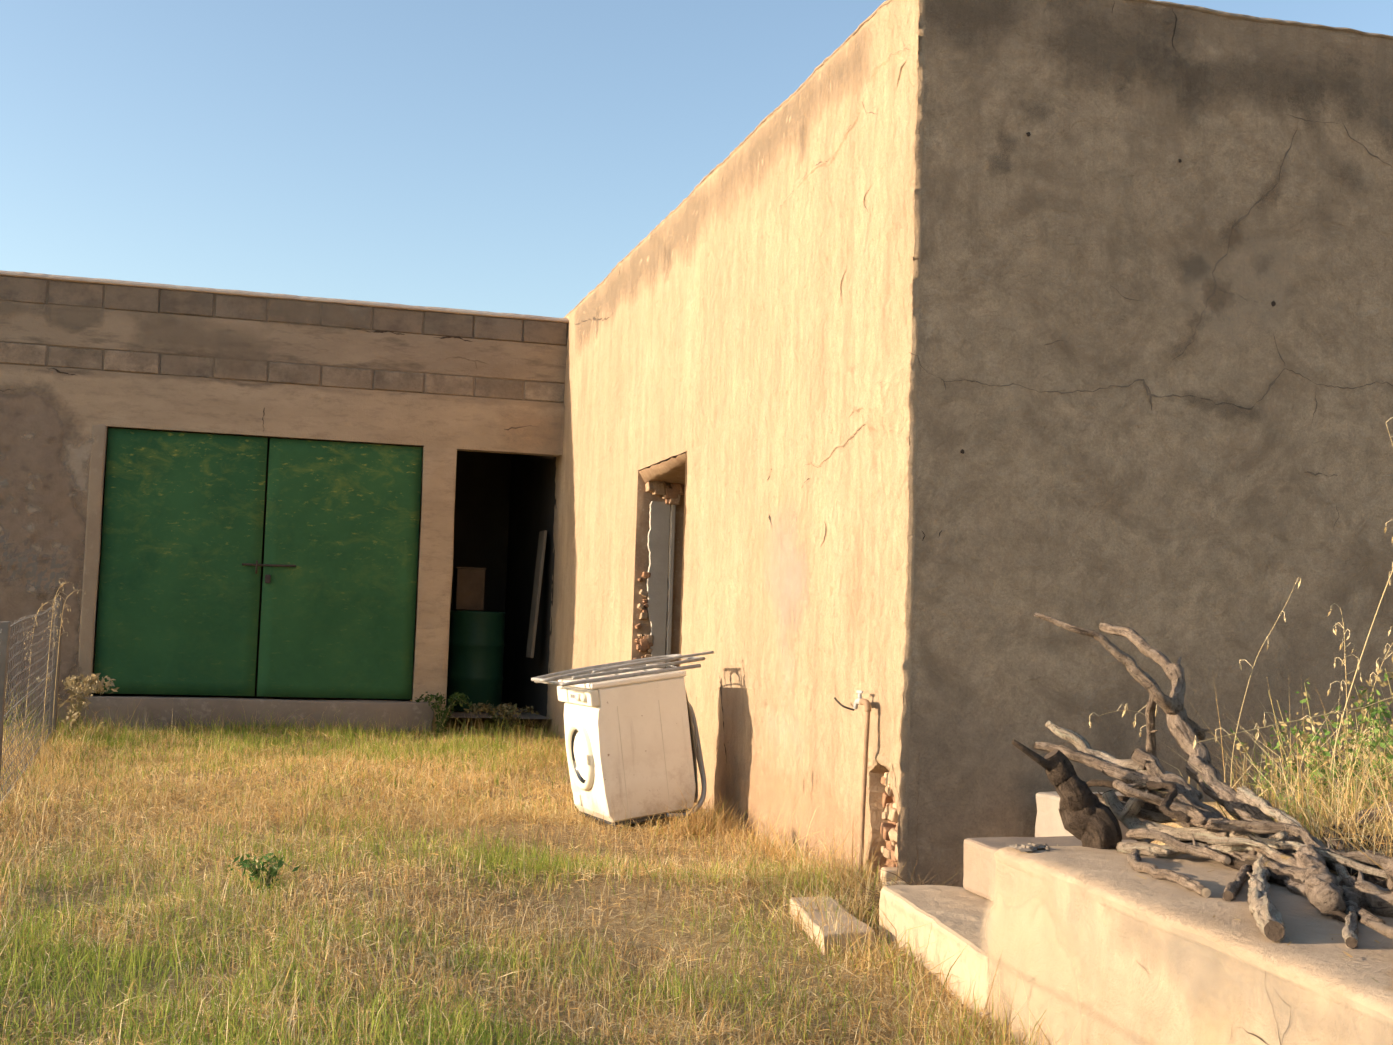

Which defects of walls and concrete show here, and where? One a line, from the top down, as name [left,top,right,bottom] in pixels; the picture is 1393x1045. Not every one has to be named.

crack [780,48,908,206]
crack [1172,115,1393,360]
crack [804,379,885,468]
crack [911,334,1393,421]
spalling [633,571,653,660]
spalling [864,753,919,892]
crack [1228,950,1291,1045]